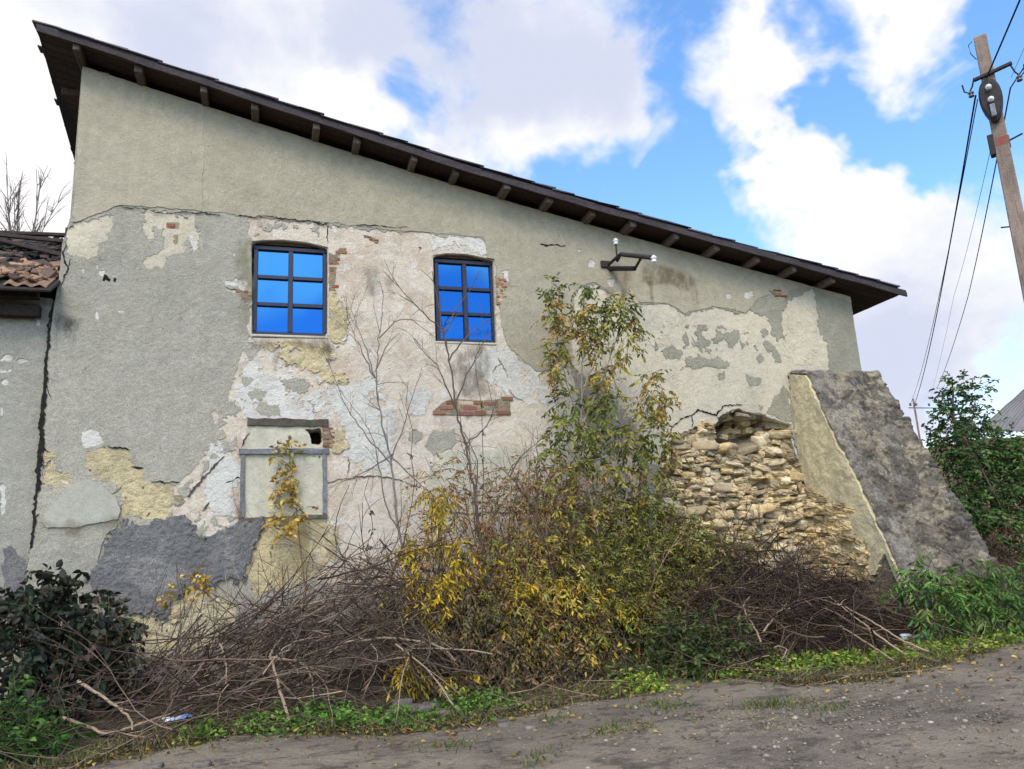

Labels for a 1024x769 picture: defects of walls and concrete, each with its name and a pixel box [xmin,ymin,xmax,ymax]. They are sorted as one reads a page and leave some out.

spalling [0,215,114,283]
crack [122,206,329,241]
peeling [81,208,829,596]
crack [668,404,742,439]
flaking render [42,449,72,491]
crack [107,434,249,511]